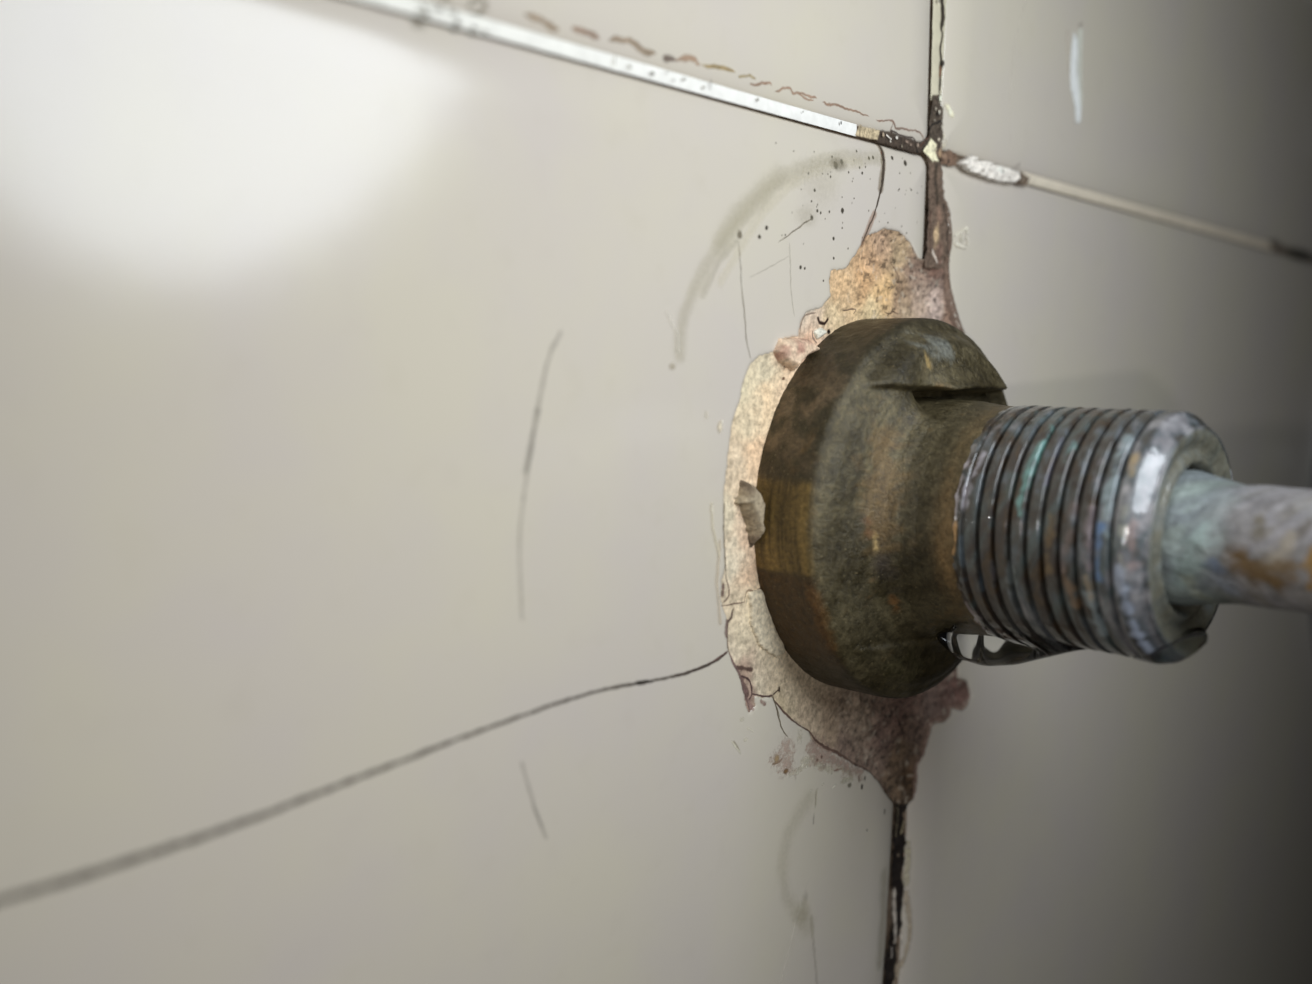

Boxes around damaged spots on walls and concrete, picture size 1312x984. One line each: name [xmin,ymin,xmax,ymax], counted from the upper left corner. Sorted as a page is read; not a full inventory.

corrosion [524,13,924,141]
flaking render [721,205,971,805]
crack [0,651,728,903]